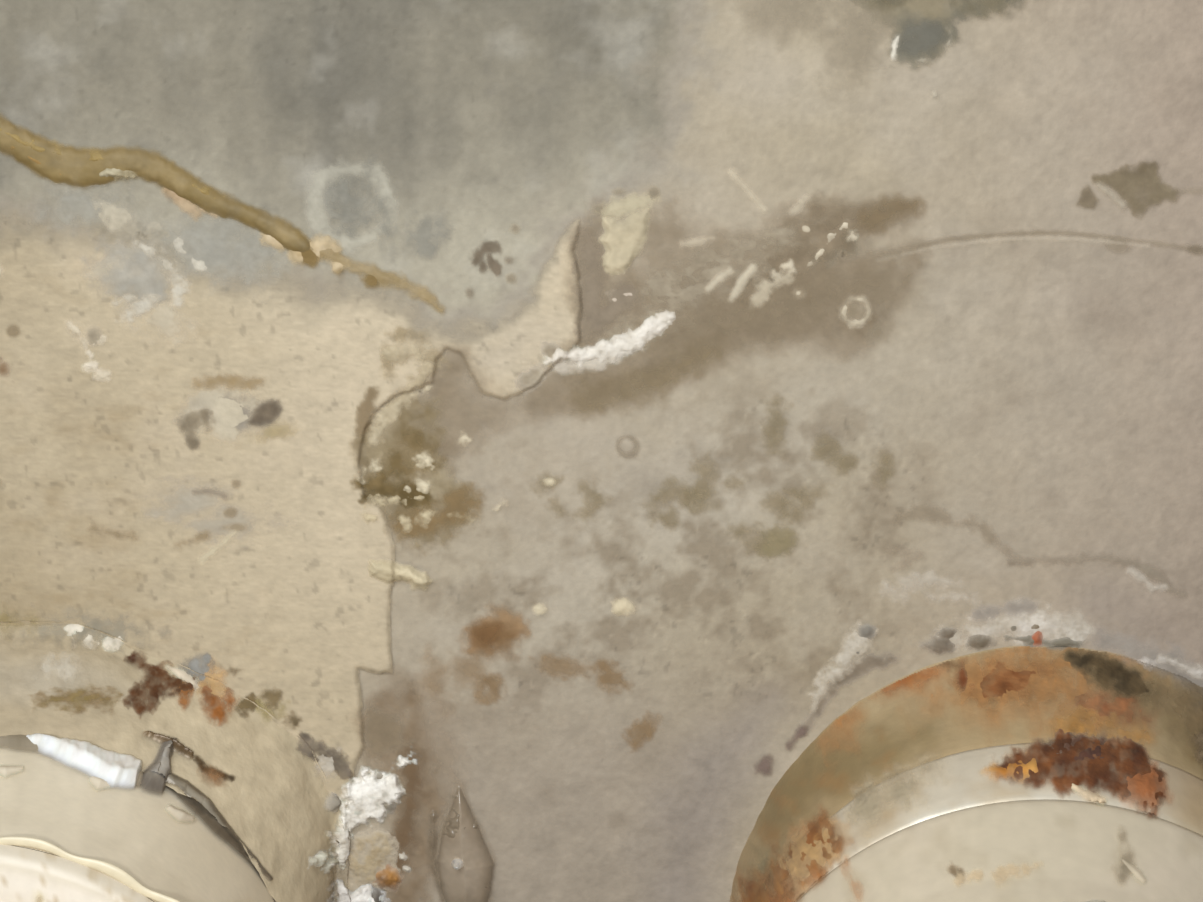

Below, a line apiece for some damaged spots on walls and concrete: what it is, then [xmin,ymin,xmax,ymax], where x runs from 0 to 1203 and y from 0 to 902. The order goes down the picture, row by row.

leakage [840,0,1016,69]
crack [0,115,443,312]
crack [842,230,1203,259]
leakage [426,199,922,472]
leakage [735,490,818,557]
corrosion [38,651,235,725]
leakage [183,654,213,682]
leakage [237,690,282,716]
corrosion [881,650,1152,701]
leakage [290,683,457,902]
corrosion [986,728,1167,817]
corrosion [731,812,843,902]